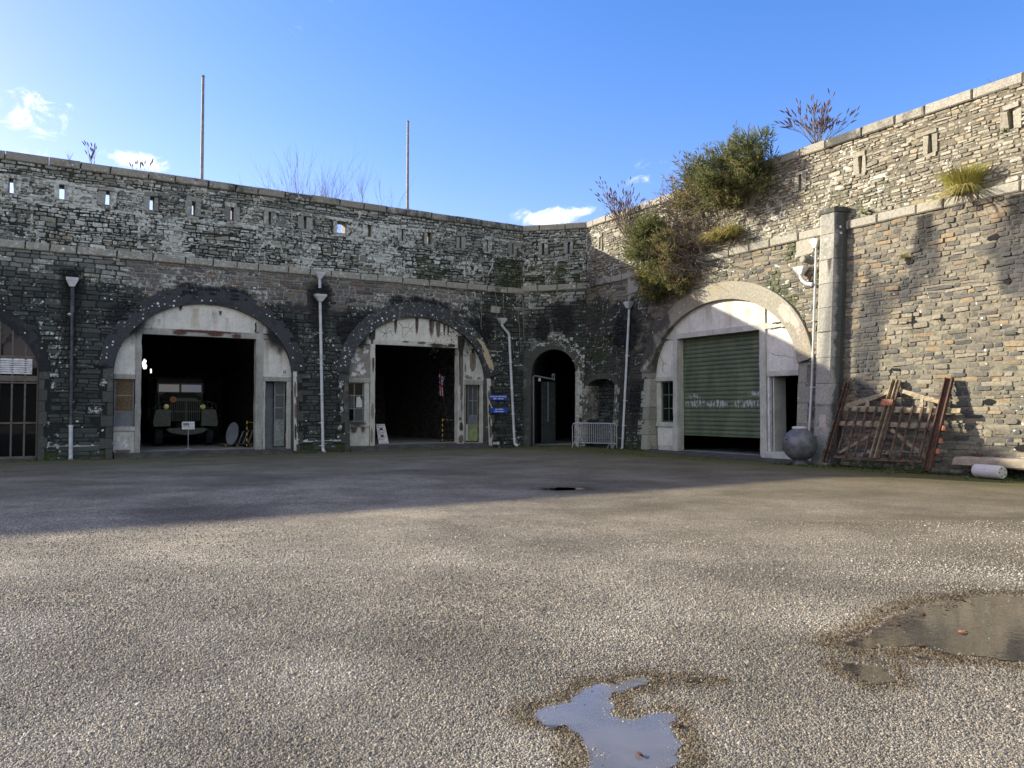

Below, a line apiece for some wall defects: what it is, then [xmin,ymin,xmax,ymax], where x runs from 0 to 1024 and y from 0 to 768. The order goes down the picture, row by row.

corrosion [173,329,241,338]
peeling [350,346,374,377]